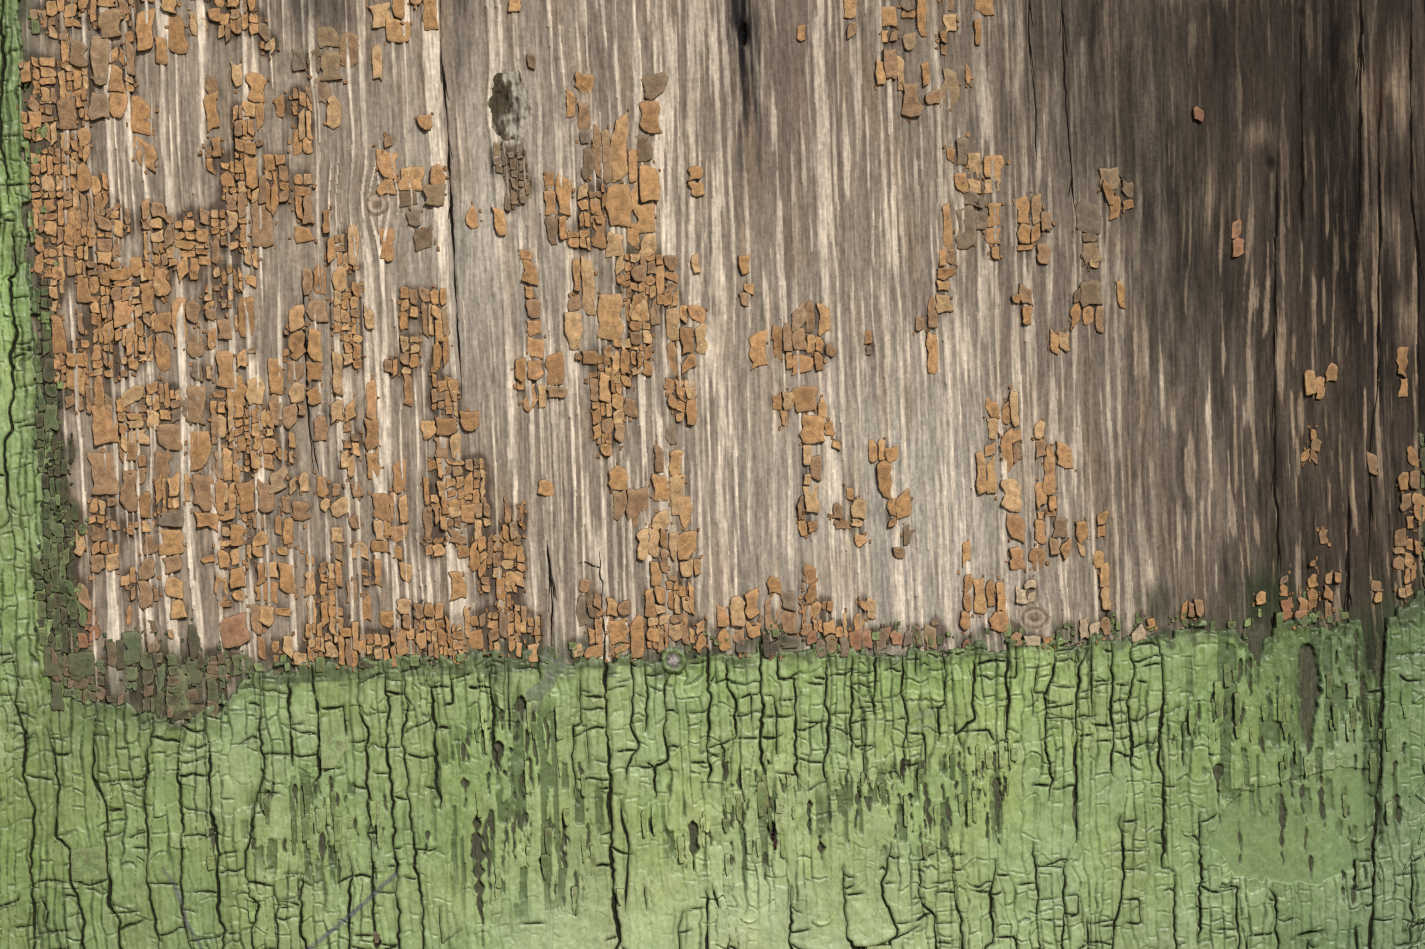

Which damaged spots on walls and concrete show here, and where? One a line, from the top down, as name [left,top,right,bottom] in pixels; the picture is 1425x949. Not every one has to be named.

crack [0,0,35,528]
crack [301,277,320,474]
crack [440,0,462,394]
peeling [16,0,1158,724]
crack [1270,15,1304,569]
peeling [1303,362,1338,400]
crack [1344,0,1425,949]
peeling [461,696,595,932]
crack [0,542,1323,949]
peeling [677,760,832,880]
peeling [845,738,1018,861]
peeling [1168,556,1405,904]